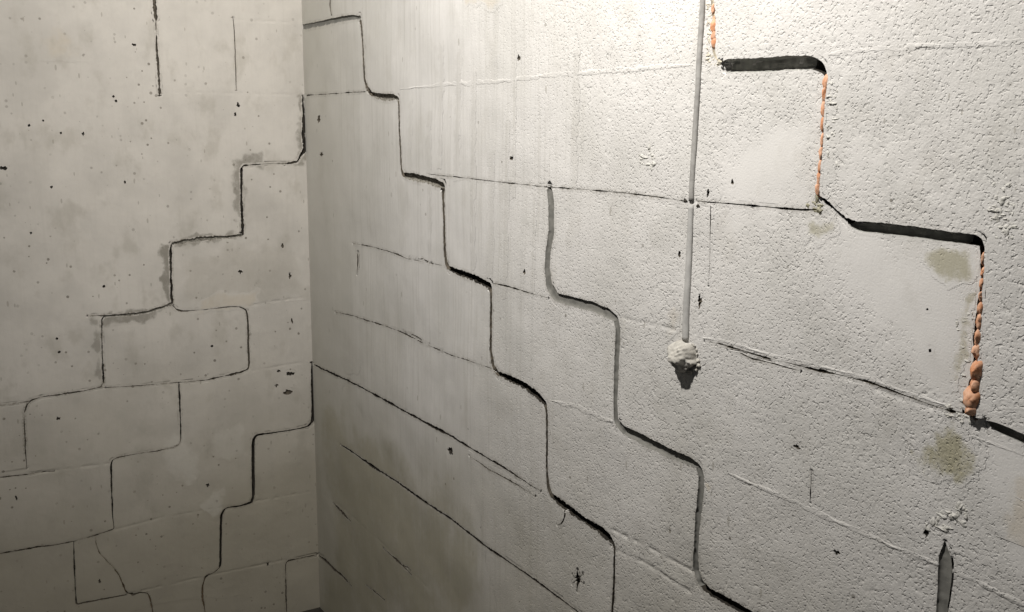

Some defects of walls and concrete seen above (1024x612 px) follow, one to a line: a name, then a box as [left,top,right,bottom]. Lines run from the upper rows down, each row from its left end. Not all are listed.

crack [0,0,757,612]
crack [697,0,1024,448]
crack [933,541,957,612]